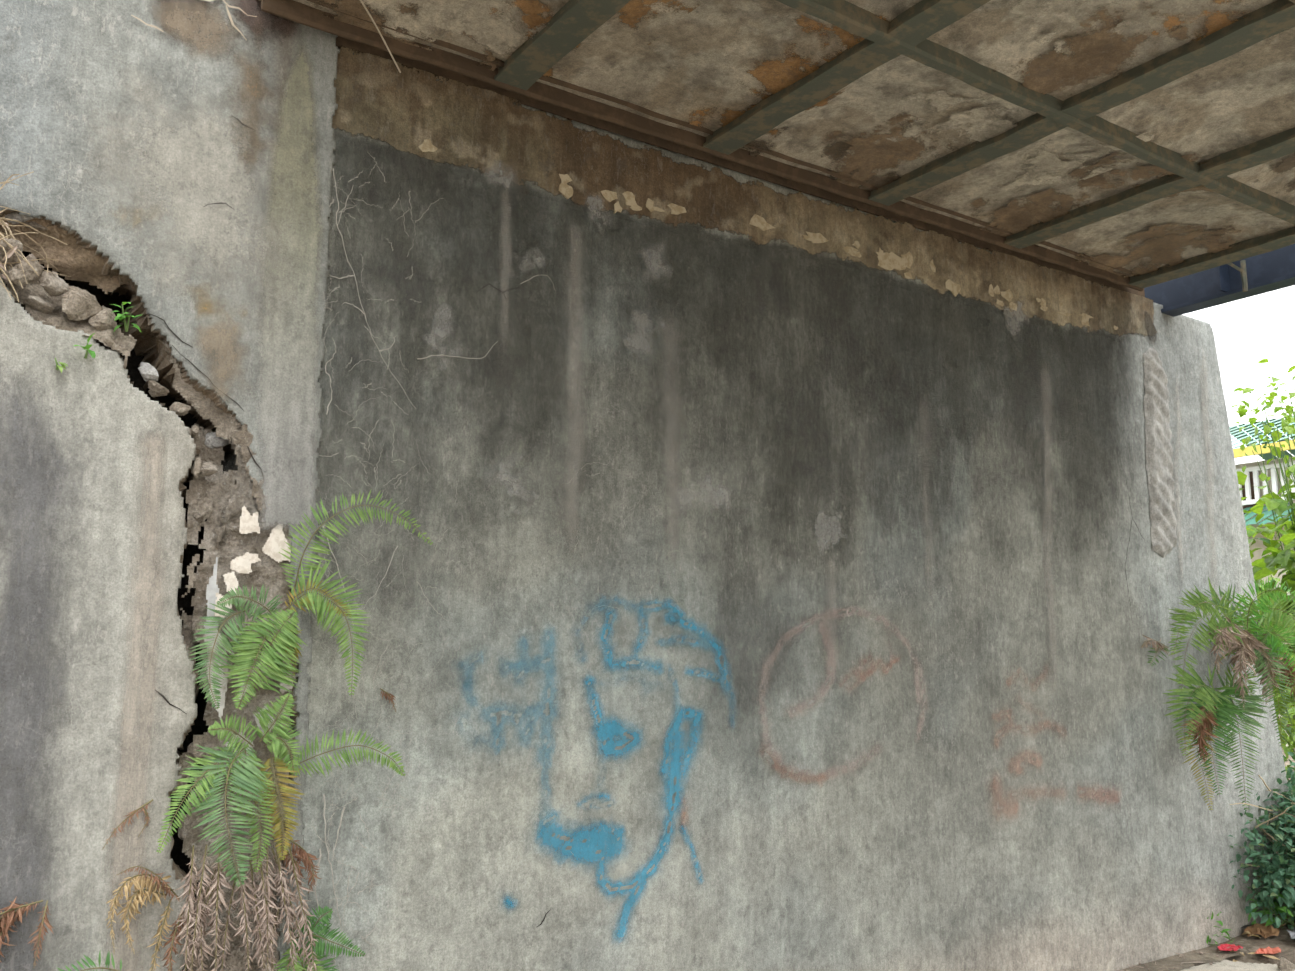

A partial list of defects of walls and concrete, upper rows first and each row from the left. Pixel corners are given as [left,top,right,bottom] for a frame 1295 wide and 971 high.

rust [159,0,209,31]
rust [230,0,297,35]
rust [314,0,433,51]
rust [688,15,865,127]
rust [1019,0,1246,95]
flaking render [332,45,1157,337]
rust [825,113,955,188]
rust [971,152,1175,237]
water stain [341,138,1121,532]
crack [0,212,264,971]
water stain [0,394,66,971]
water stain [107,434,163,971]